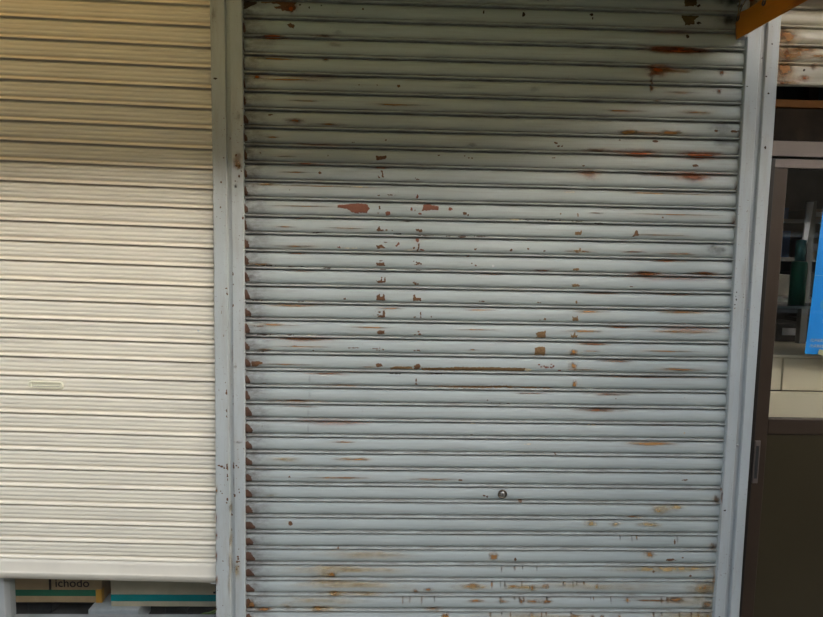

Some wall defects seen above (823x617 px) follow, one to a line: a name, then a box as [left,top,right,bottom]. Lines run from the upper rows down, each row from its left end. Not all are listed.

corrosion [771,30,823,85]